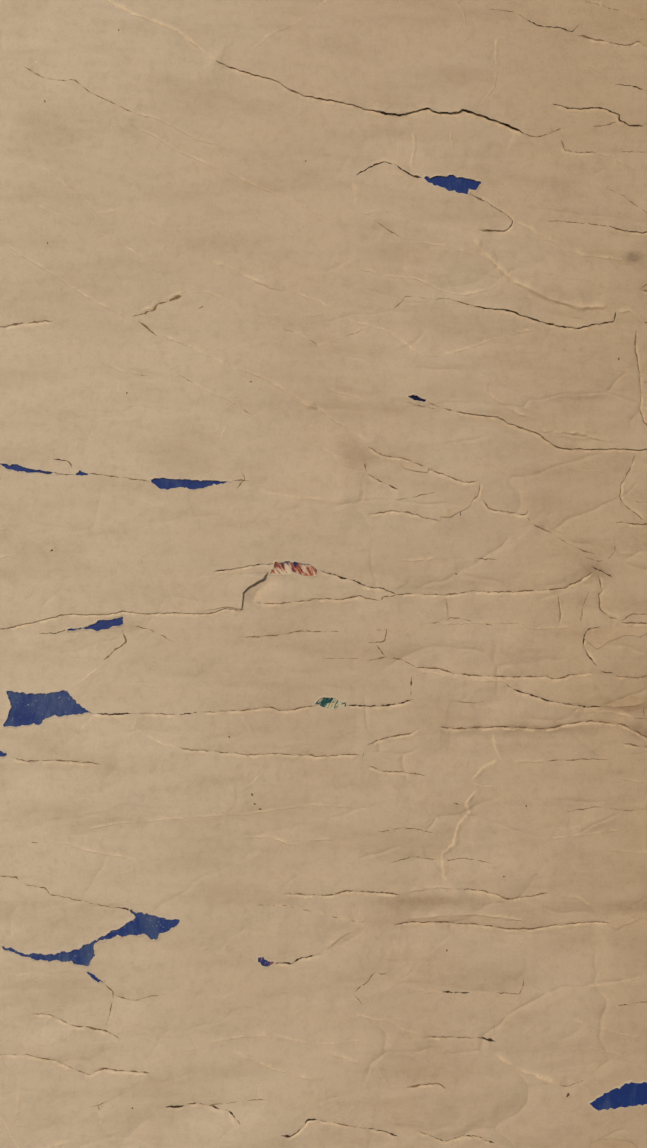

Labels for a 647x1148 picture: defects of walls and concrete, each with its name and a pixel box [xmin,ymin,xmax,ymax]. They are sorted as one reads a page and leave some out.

crack [492,9,647,51]
crack [131,290,203,336]
crack [30,459,146,481]
crack [180,447,647,779]
crack [104,626,171,660]
crack [91,706,313,720]
crack [1,876,133,912]
crack [285,890,399,901]
crack [34,984,158,1042]
crack [0,1054,148,1110]
crack [164,1099,263,1127]
crack [280,1118,399,1142]